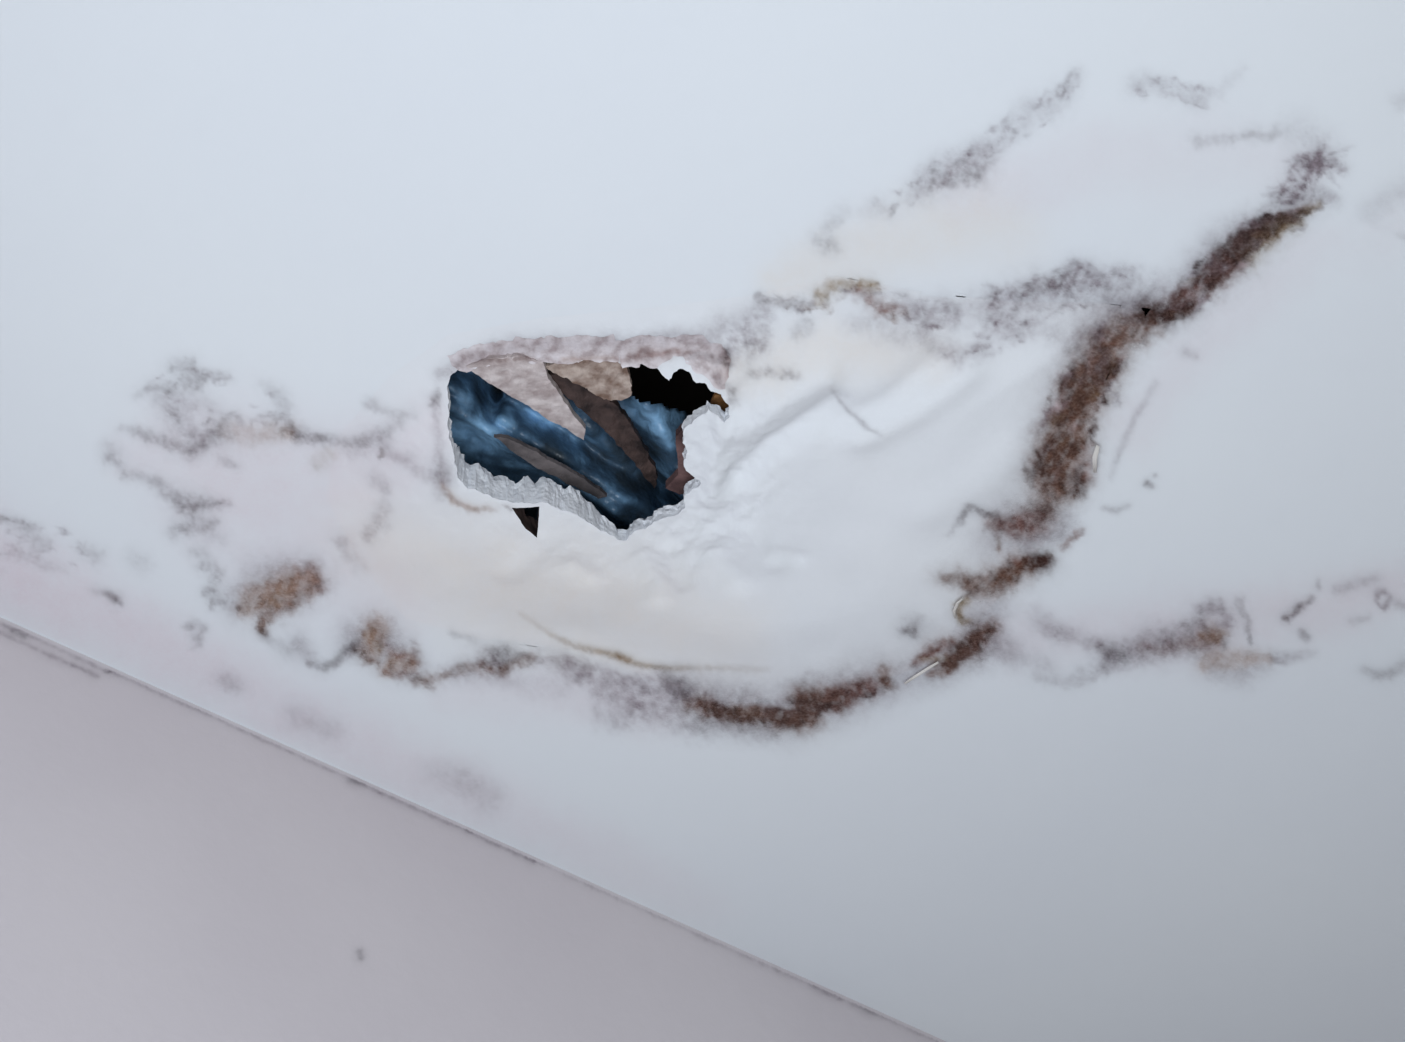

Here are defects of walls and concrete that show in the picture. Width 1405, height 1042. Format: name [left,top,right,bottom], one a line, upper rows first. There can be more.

water stain [913,152,1323,675]
water stain [681,676,890,730]